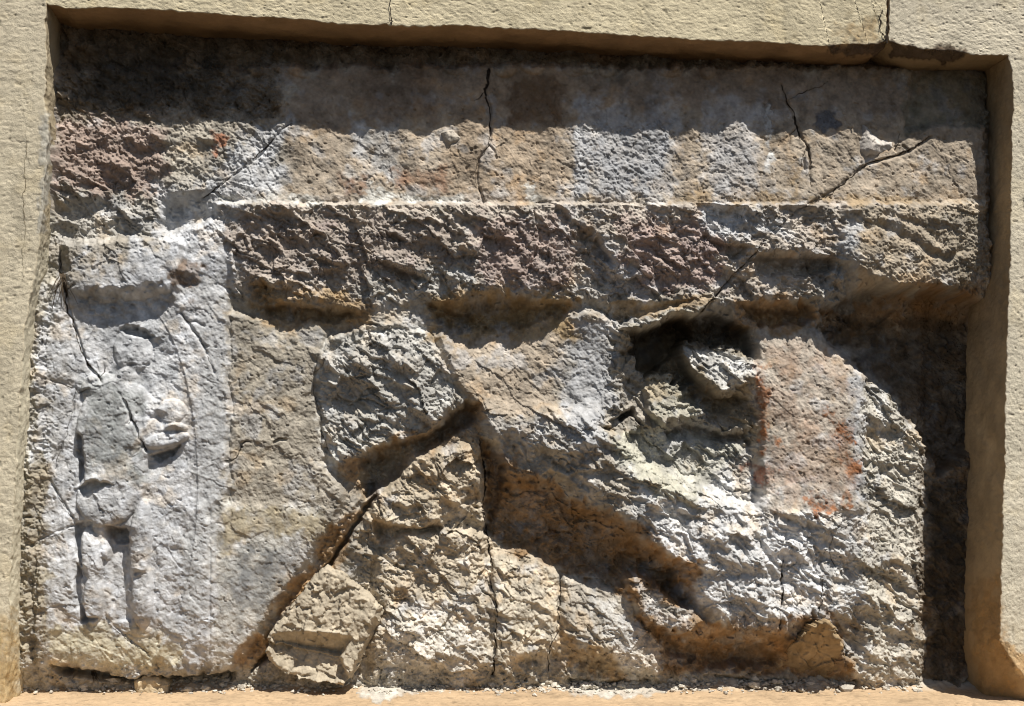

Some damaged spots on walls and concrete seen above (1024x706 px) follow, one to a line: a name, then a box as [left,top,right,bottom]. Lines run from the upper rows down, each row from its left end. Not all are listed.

crack [879,0,890,43]
crack [203,123,292,198]
crack [474,68,498,204]
crack [701,81,928,312]
crack [44,250,106,537]
rust [741,368,781,486]
rust [824,414,861,474]
rust [804,495,853,519]